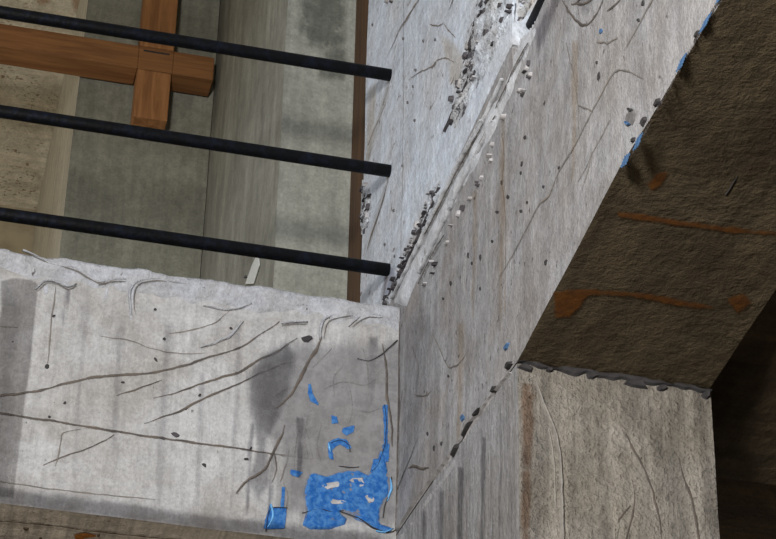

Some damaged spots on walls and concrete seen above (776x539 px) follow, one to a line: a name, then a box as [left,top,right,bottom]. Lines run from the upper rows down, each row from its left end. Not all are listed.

crack [386,0,418,57]
spalling [443,0,535,132]
crack [562,0,620,27]
crack [495,45,641,307]
crack [47,288,56,363]
crack [0,311,297,466]
crack [274,337,332,409]
crack [0,481,155,500]
peeling [263,487,288,532]
water stain [258,346,400,520]
peeling [290,404,396,534]
crack [397,442,429,489]